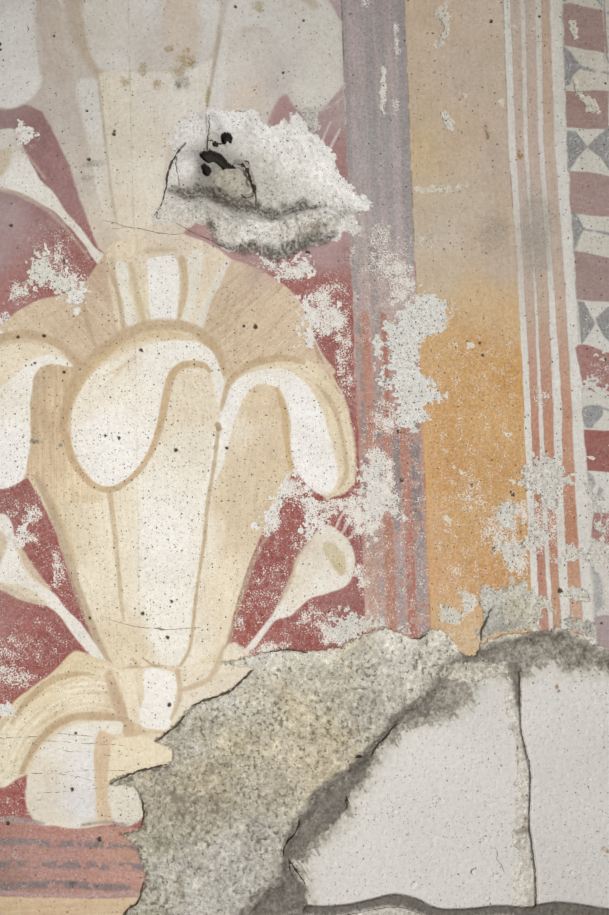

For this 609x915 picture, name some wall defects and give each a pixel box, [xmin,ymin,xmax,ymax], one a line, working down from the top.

peeling [0,242,91,333]
peeling [368,284,448,435]
spalling [110,449,609,915]